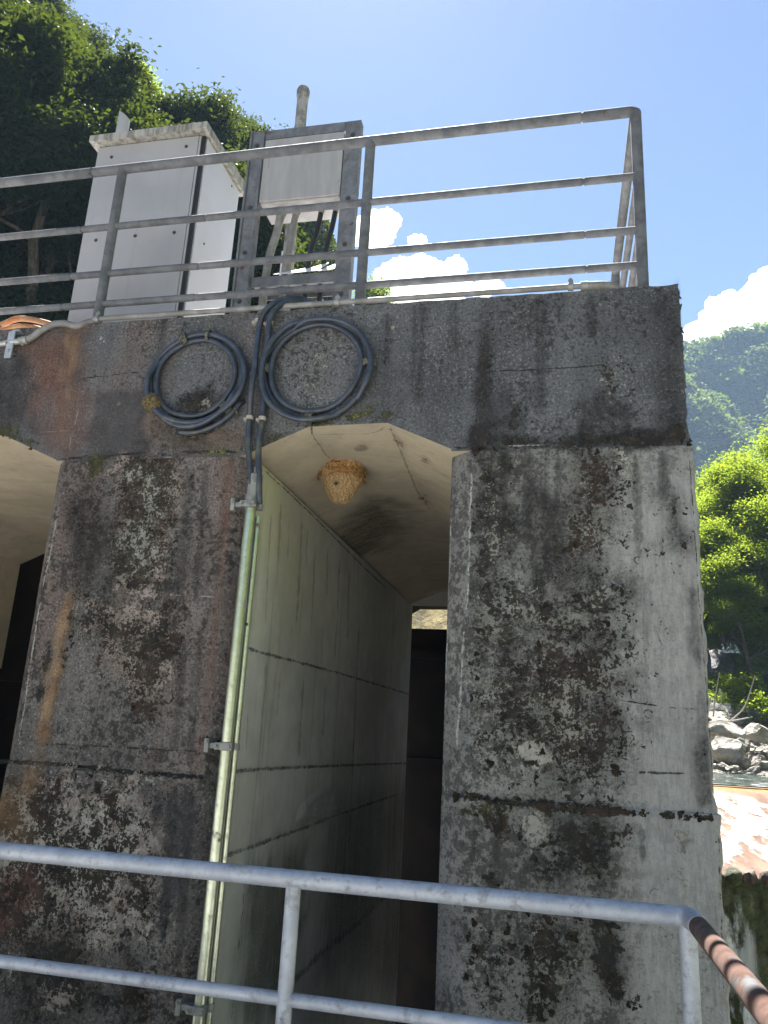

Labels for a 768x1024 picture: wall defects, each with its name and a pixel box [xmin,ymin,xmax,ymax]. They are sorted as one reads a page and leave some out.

leakage [467,329,543,447]
crack [475,325,605,425]
leakage [526,398,637,592]
corrosion [38,597,70,742]
peeling [452,686,599,873]
peeling [671,810,706,822]
leakage [696,738,710,803]
leakage [162,876,186,932]